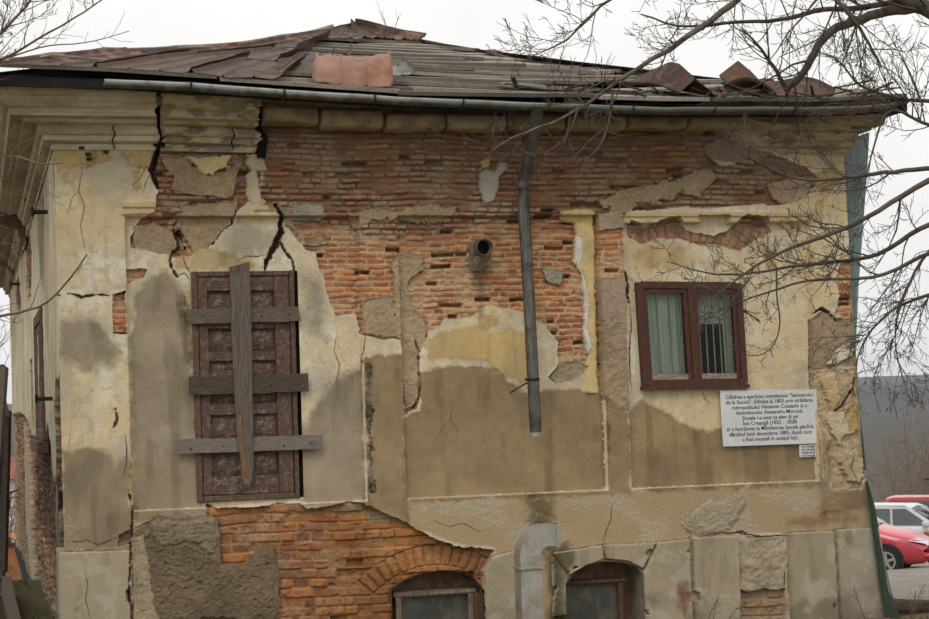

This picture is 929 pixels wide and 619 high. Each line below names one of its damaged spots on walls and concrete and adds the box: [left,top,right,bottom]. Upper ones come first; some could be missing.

crack [133,93,165,192]
flaking render [260,99,517,117]
crack [168,219,190,278]
crack [236,203,298,271]
flaking render [55,124,840,415]
flaking render [807,262,866,490]
flaking render [13,374,72,619]
crack [56,407,154,619]
flaking render [206,501,494,619]